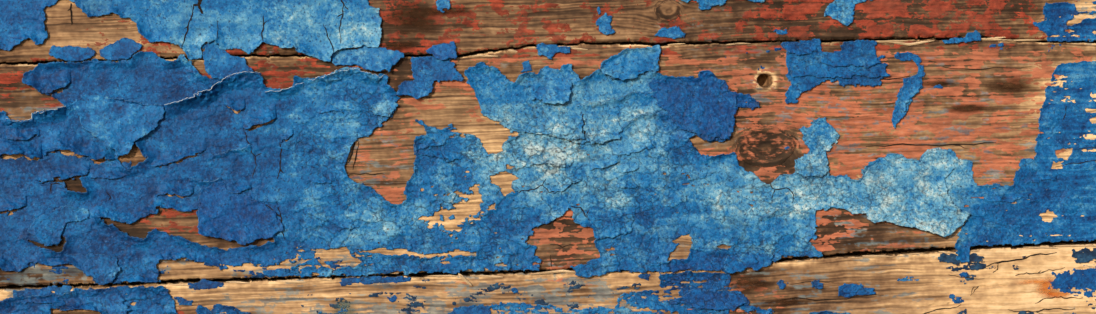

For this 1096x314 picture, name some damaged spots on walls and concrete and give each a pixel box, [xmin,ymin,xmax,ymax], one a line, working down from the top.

peeling [0,0,187,193]
peeling [107,0,1096,204]
peeling [0,235,131,314]
peeling [100,194,274,251]
peeling [141,164,693,314]
peeling [716,206,1096,314]
rust [1026,280,1068,297]